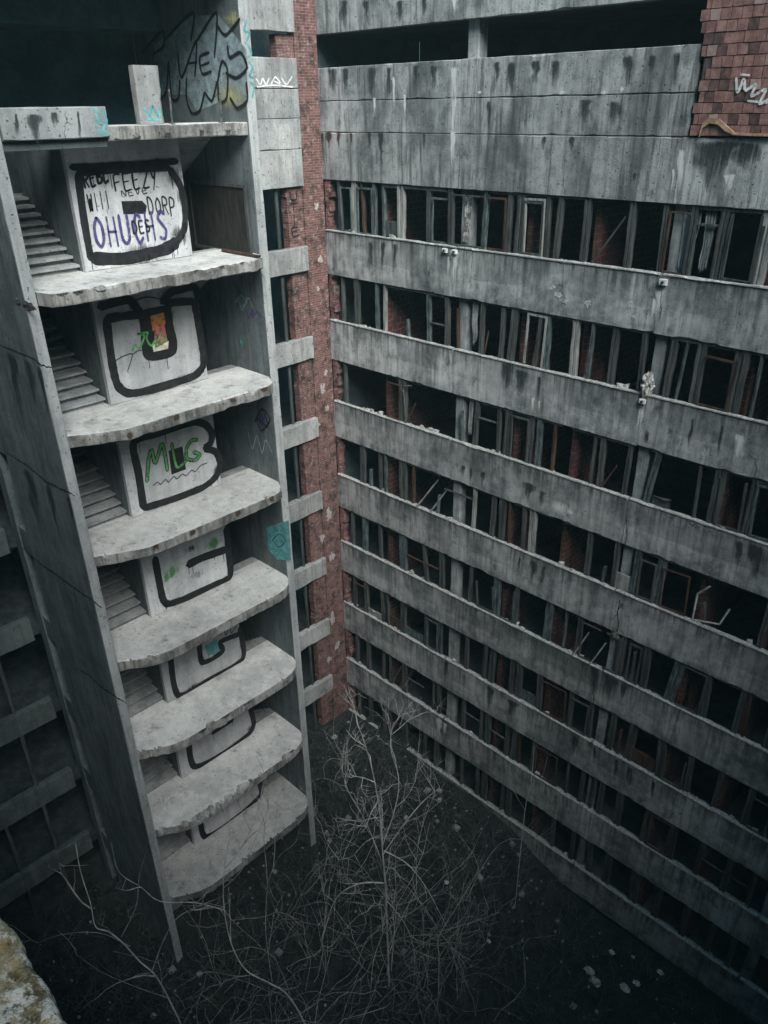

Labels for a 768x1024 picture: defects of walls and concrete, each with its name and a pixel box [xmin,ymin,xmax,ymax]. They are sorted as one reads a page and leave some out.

leakage [329,69,348,89]
leakage [368,67,406,112]
leakage [495,62,515,91]
leakage [532,61,566,94]
leakage [581,56,632,121]
leakage [15,112,57,142]
leakage [502,363,541,409]
leakage [718,426,744,457]